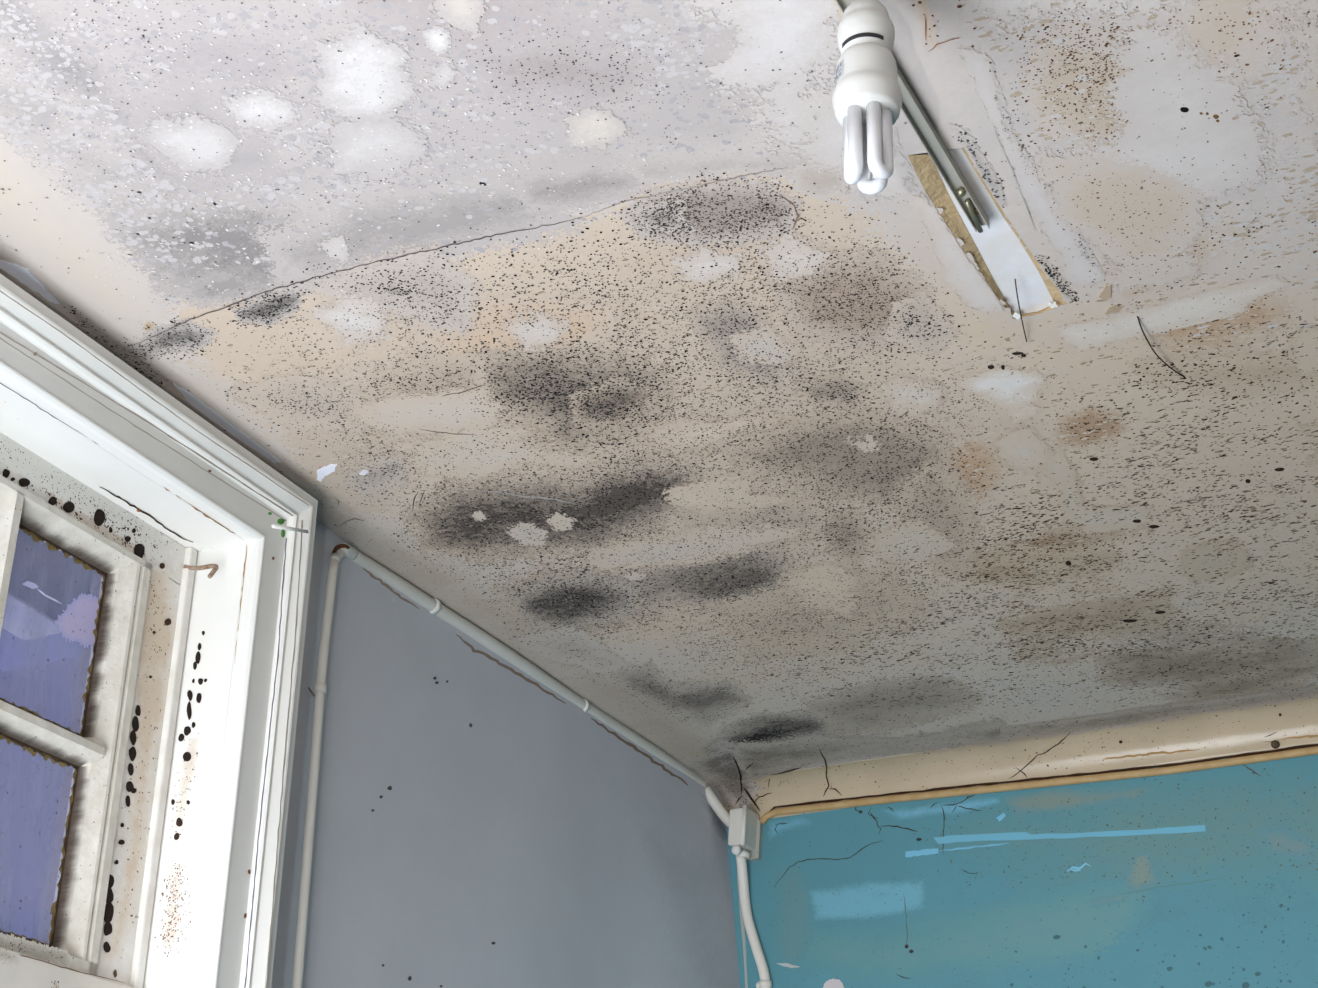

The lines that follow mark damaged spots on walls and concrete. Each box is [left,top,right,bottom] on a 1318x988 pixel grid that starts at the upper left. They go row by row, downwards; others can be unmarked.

water stain [980,53,1061,209]
crack [122,168,799,350]
rust [164,487,247,664]
water stain [0,432,178,988]
water stain [170,631,207,841]
crack [733,756,760,811]
water stain [1103,743,1205,760]
crack [775,806,976,886]
water stain [154,859,191,957]
crack [893,877,911,979]
spalling [823,979,844,988]